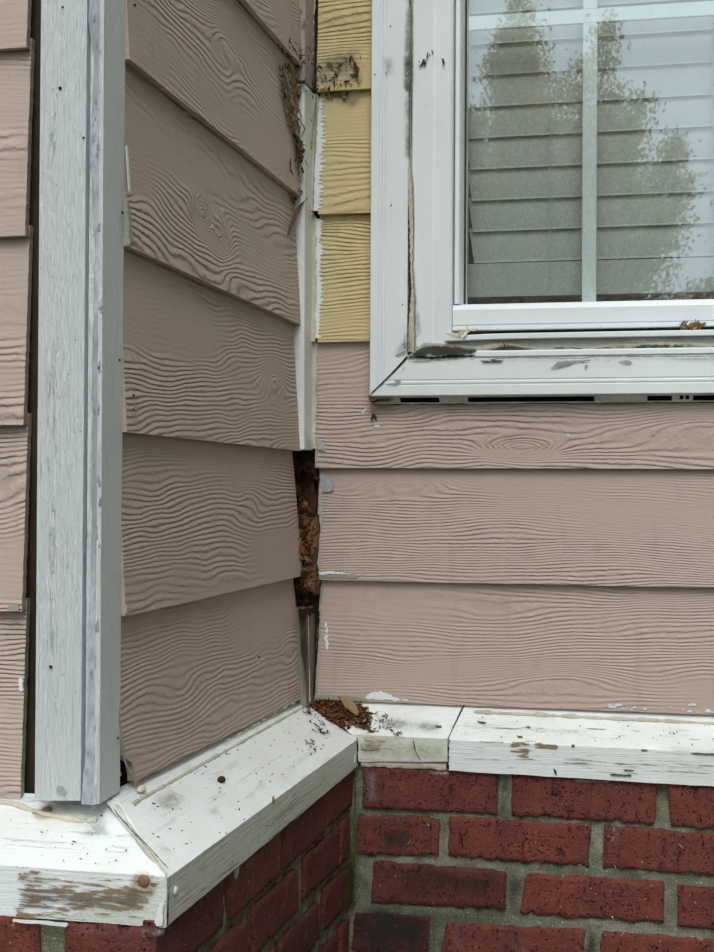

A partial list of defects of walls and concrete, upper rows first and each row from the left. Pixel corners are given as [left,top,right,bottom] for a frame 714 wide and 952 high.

peeling [293,485,312,607]
peeling [466,721,558,766]
peeling [563,728,714,776]
peeling [14,871,156,921]